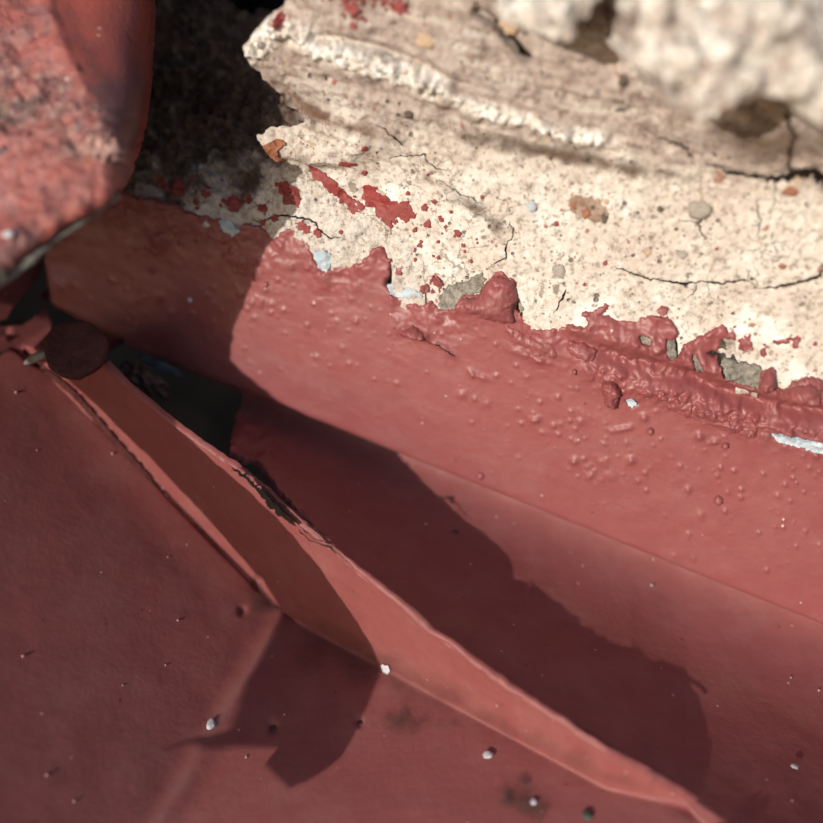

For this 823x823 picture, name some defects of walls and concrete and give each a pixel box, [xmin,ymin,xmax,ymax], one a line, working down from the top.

peeling [274,181,302,208]
crack [255,214,340,239]
peeling [308,161,473,263]
crack [376,125,482,204]
crack [492,222,514,265]
spalling [569,194,610,224]
crack [658,112,823,254]
spalling [387,267,487,311]
crack [615,267,823,299]
spalling [721,334,801,389]
peeling [771,433,823,454]
crack [232,467,351,566]